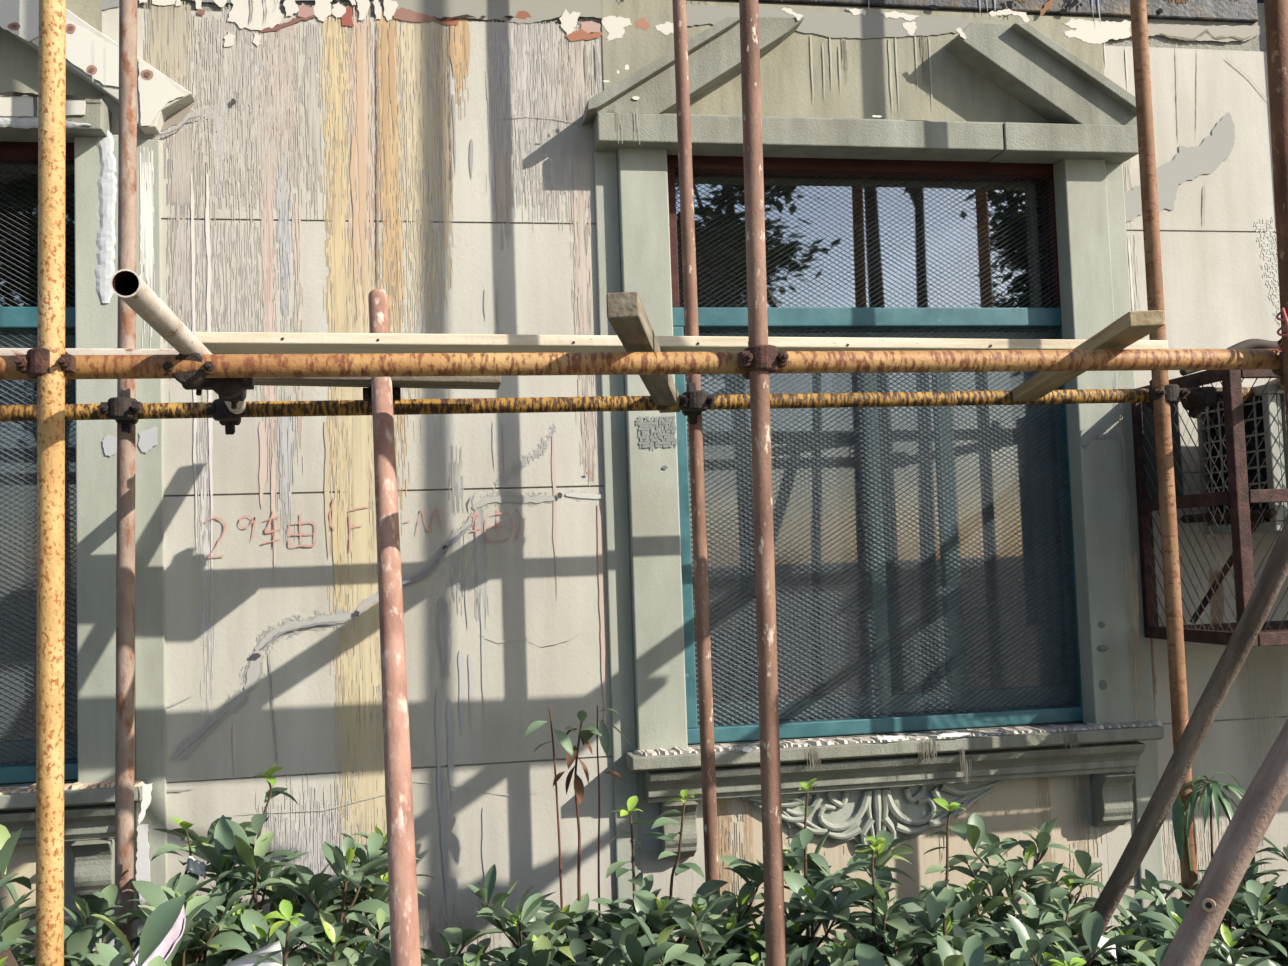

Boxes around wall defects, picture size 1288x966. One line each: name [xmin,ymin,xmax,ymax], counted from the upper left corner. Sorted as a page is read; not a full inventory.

spalling [139,0,740,47]
spalling [759,8,972,39]
peeling [1062,18,1132,44]
spalling [1148,24,1260,42]
crack [402,493,475,585]
crack [265,617,355,767]